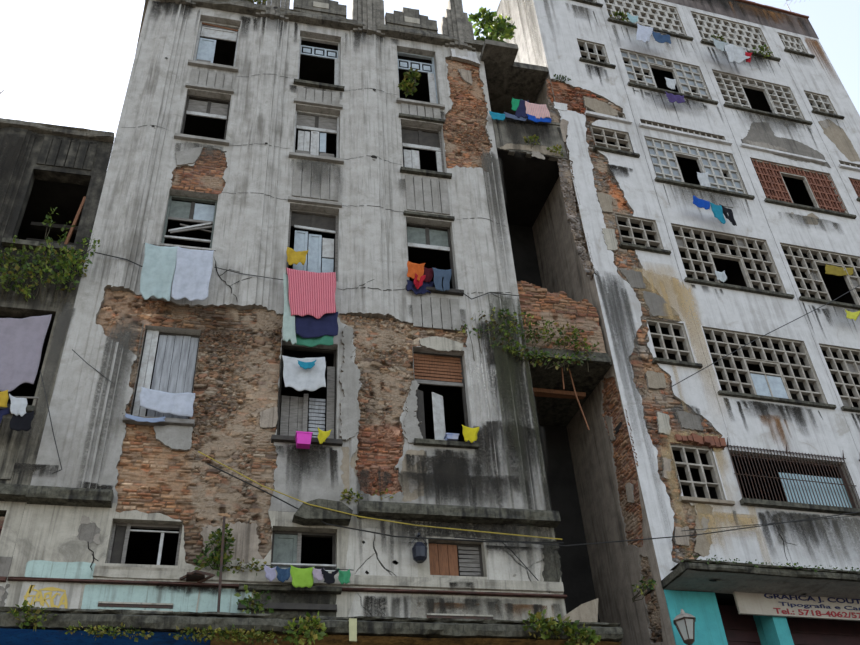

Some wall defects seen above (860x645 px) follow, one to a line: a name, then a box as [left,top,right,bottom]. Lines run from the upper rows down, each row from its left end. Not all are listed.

leakage [707,0,803,24]
spalling [171,146,227,194]
spalling [443,49,722,563]
leakage [595,272,634,330]
spalling [96,289,283,566]
spalling [338,314,467,502]
leakage [724,398,821,423]
peeling [77,515,101,544]
spalling [602,377,663,643]
peeling [542,539,562,593]